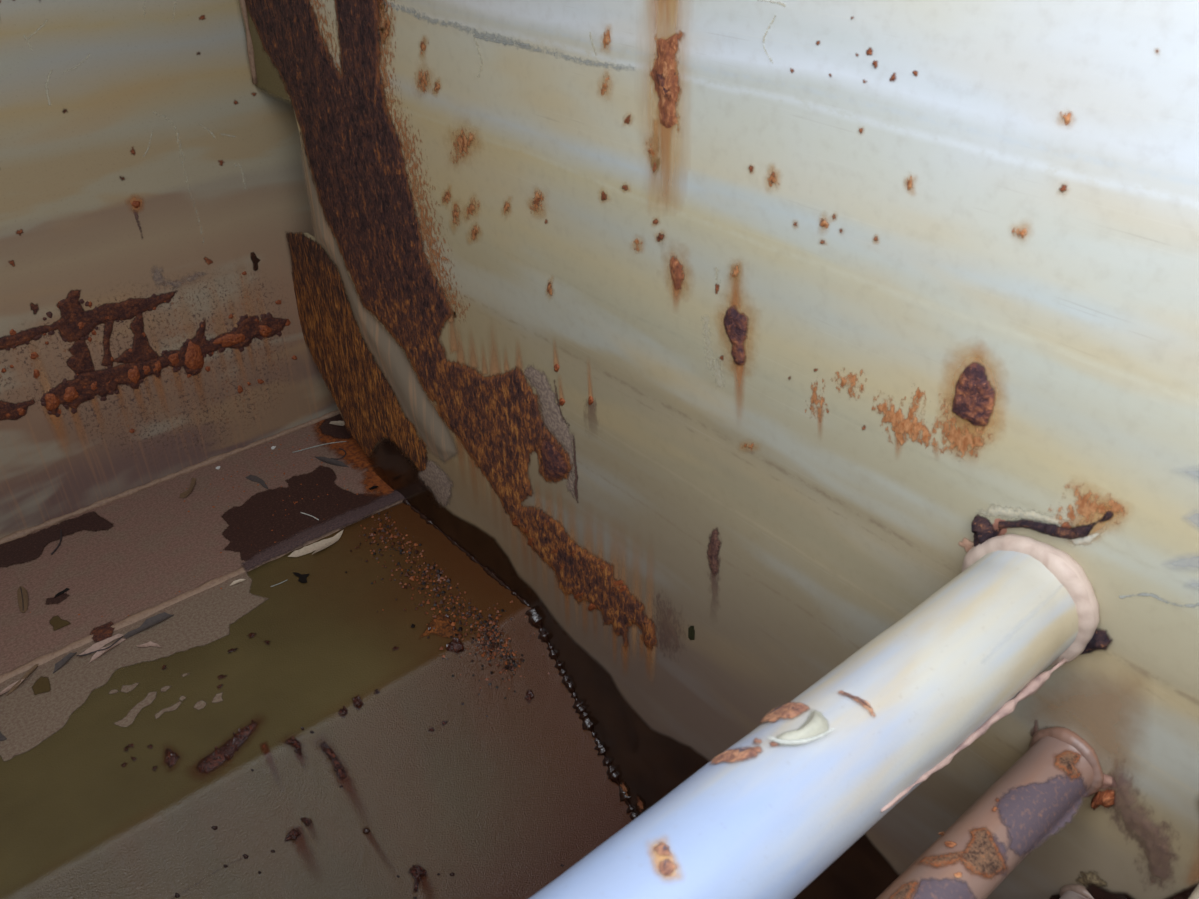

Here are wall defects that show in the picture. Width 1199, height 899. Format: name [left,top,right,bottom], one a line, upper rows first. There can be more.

corrosion [648,0,683,181]
corrosion [670,256,684,296]
corrosion [0,332,73,420]
corrosion [63,0,657,659]
peeling [524,366,575,496]
corrosion [719,296,748,387]
corrosion [805,362,995,458]
peeling [288,529,344,557]
corrosion [707,528,721,585]
peeling [53,612,173,673]
corrosion [197,719,257,774]